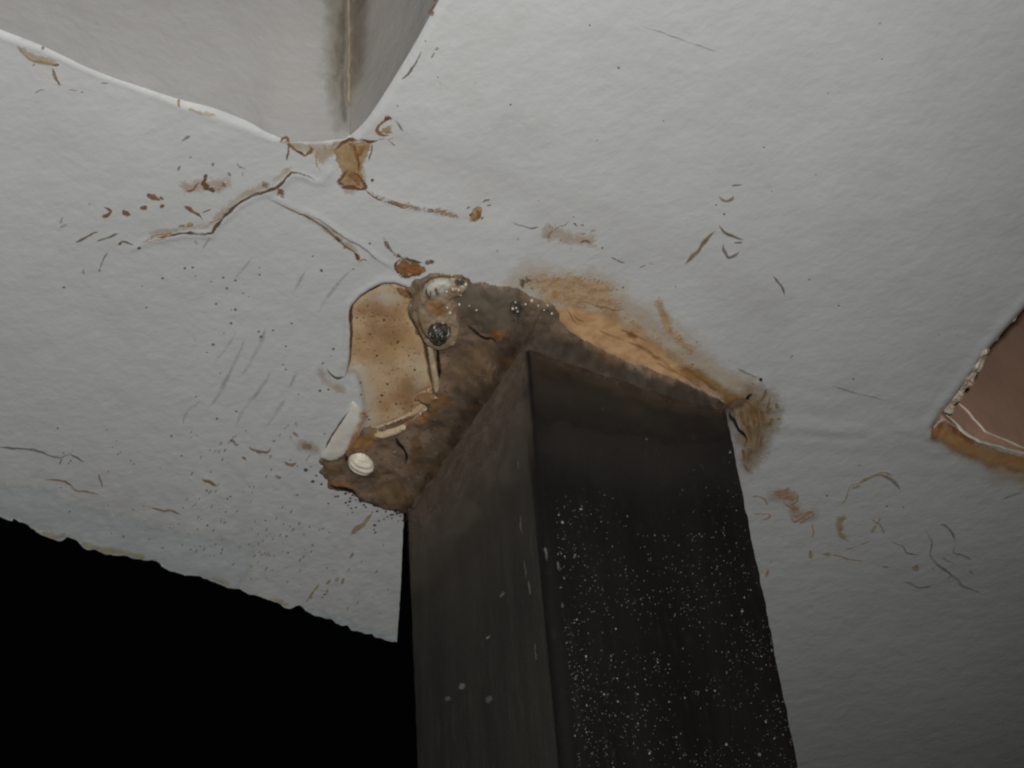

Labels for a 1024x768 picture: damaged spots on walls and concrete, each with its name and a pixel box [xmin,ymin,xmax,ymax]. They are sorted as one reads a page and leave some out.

crack [77,172,368,261]
corrosion [281,116,491,222]
peeling [319,273,726,514]
peeling [944,348,1024,454]
crack [843,472,899,503]
crack [883,524,973,588]